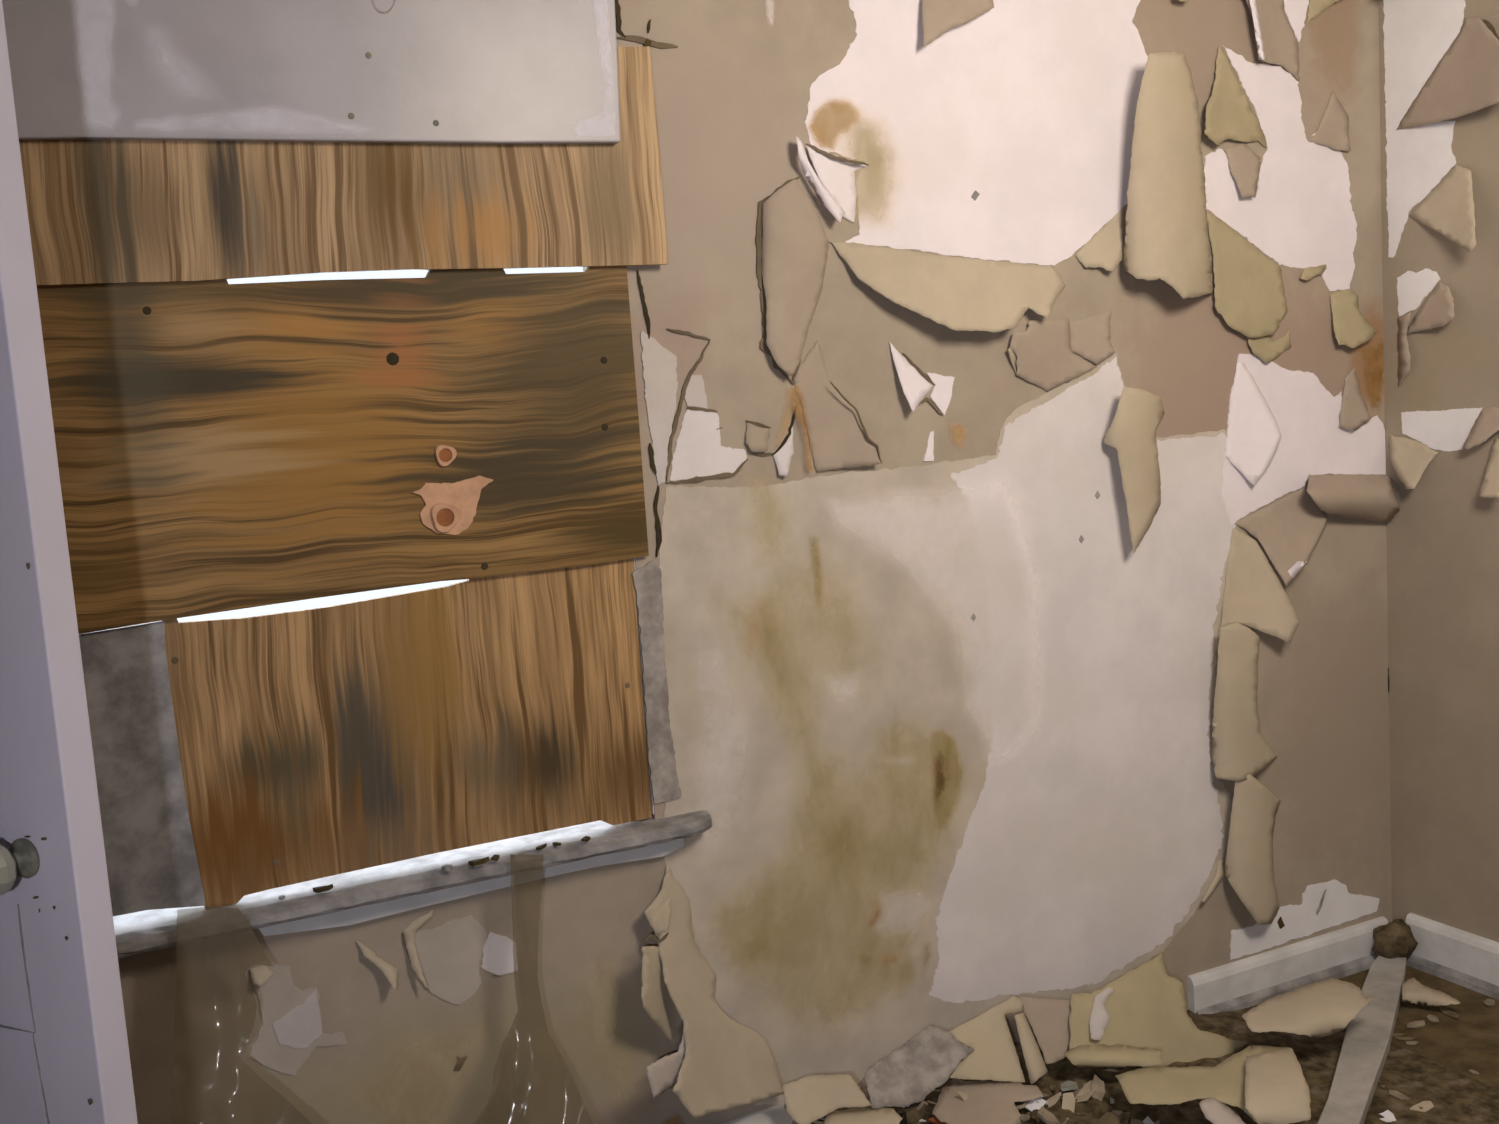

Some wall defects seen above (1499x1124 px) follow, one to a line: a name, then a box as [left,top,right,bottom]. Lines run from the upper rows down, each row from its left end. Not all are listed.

damp [835,488,1037,754]
damp [700,661,744,828]
damp [717,537,963,1025]
flaking render [402,910,514,1005]
flaking render [1230,879,1379,960]